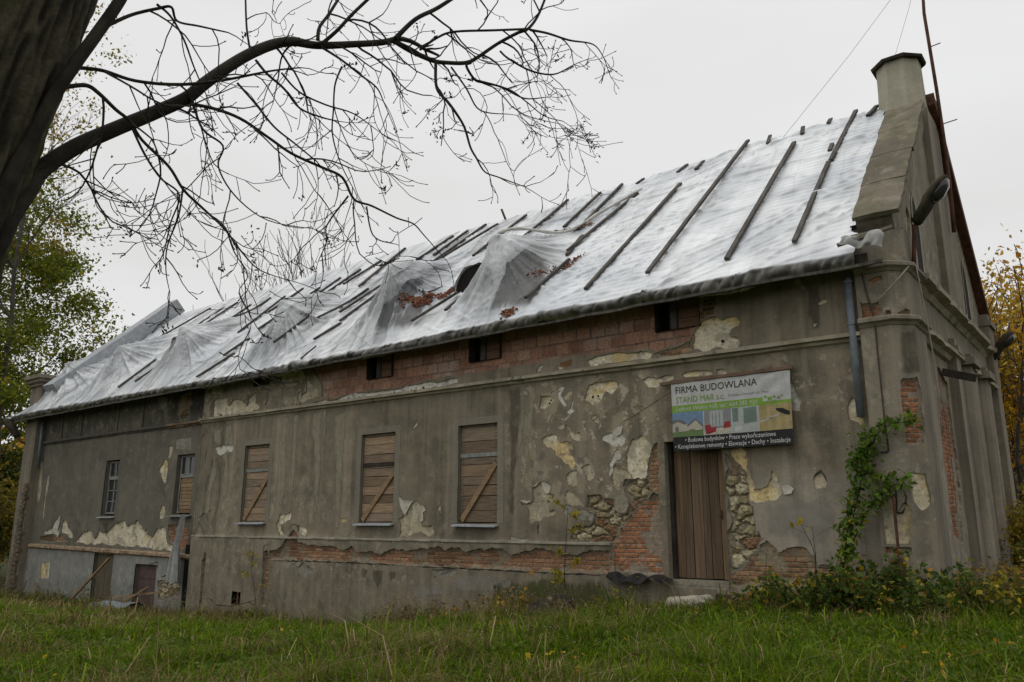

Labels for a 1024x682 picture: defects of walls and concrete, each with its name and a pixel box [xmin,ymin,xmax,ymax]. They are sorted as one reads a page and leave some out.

peeling [587,295,740,367]
peeling [208,383,260,417]
flaking render [900,377,925,446]
peeling [37,460,189,551]
peeling [159,437,192,483]
flaking render [261,380,665,607]
flaking render [724,447,839,588]
flaking render [879,472,931,554]
flaking render [937,367,963,545]